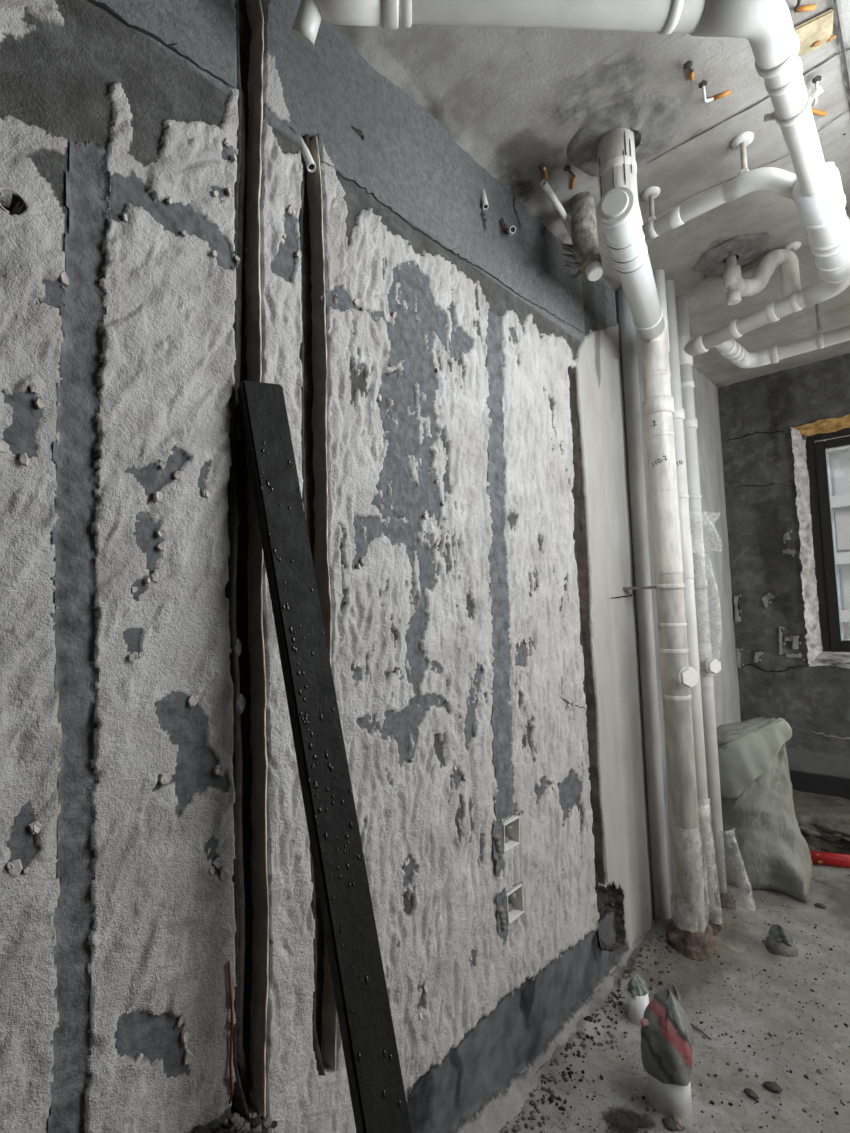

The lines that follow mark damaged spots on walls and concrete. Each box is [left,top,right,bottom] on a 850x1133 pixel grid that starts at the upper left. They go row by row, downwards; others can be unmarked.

spalling [0,384,45,467]
spalling [125,447,189,601]
spalling [198,460,212,498]
spalling [321,261,472,767]
spalling [122,627,145,662]
spalling [515,638,531,672]
spalling [464,662,486,749]
spalling [152,691,229,817]
spalling [534,766,584,826]
spalling [402,855,419,886]
spalling [492,818,509,945]
spalling [595,882,626,951]